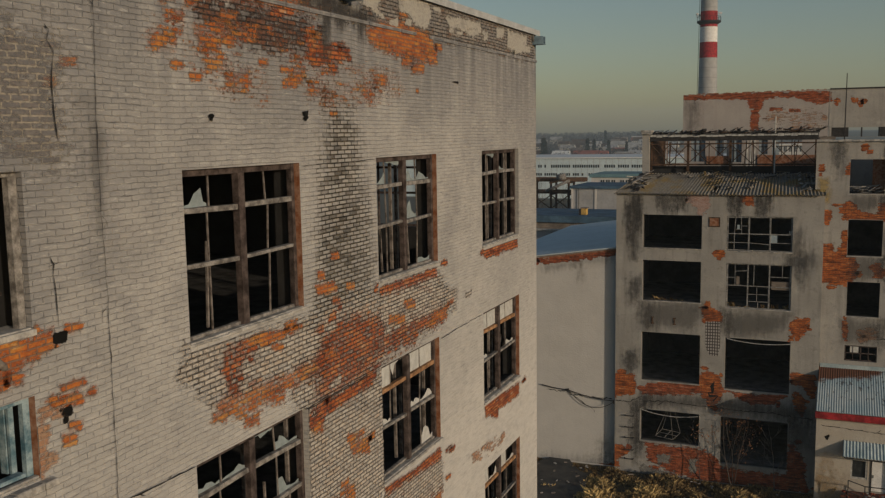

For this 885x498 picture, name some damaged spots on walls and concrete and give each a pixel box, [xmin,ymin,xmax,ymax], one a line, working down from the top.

peeling [146,0,403,118]
peeling [346,0,535,75]
flaking render [683,91,868,131]
water stain [309,107,377,341]
flaking render [536,249,616,265]
flaking render [822,201,885,289]
peeling [0,322,85,394]
peeling [37,377,97,480]
peeling [177,258,472,498]
flaking render [615,366,817,417]
flaking render [639,439,814,493]
flaking render [788,317,812,342]